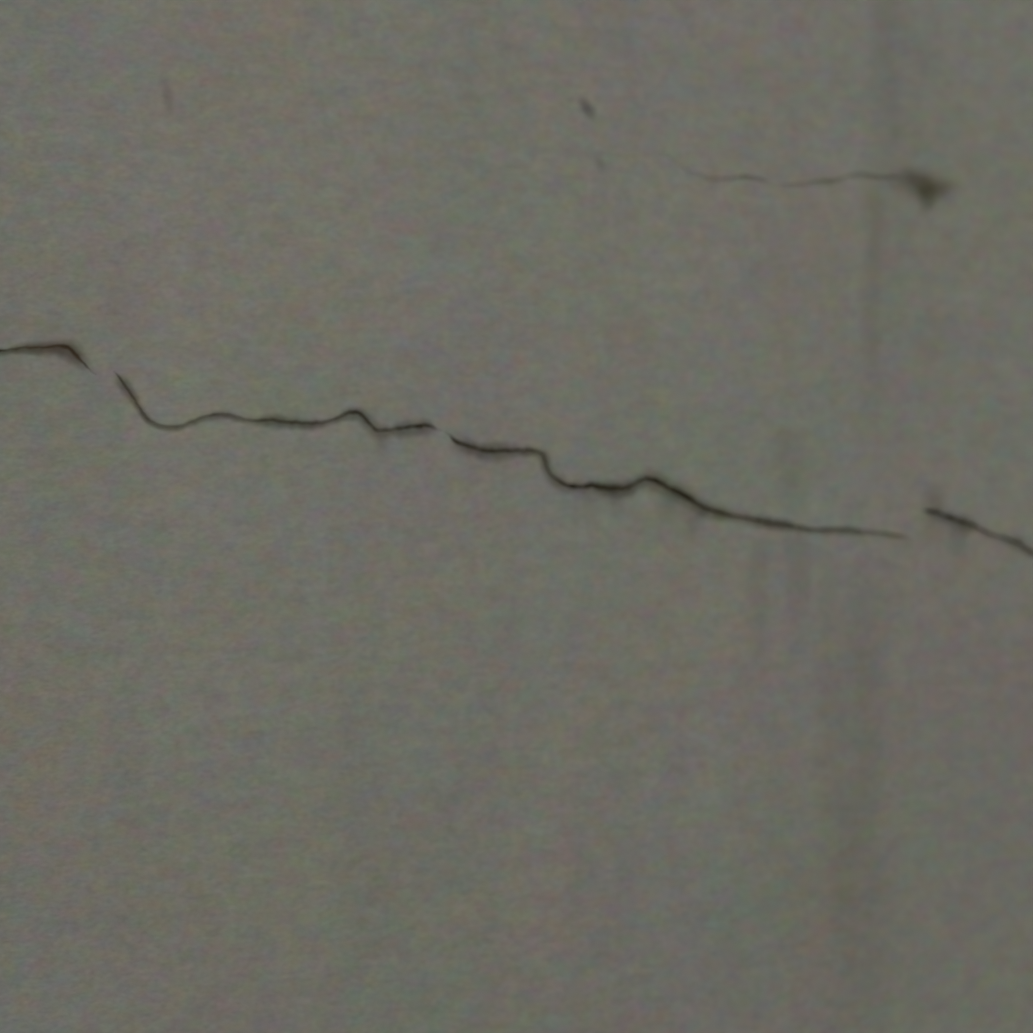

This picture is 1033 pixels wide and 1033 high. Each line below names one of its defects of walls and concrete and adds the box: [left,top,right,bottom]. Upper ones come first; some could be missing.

crack [0,344,908,538]
crack [922,509,1033,553]